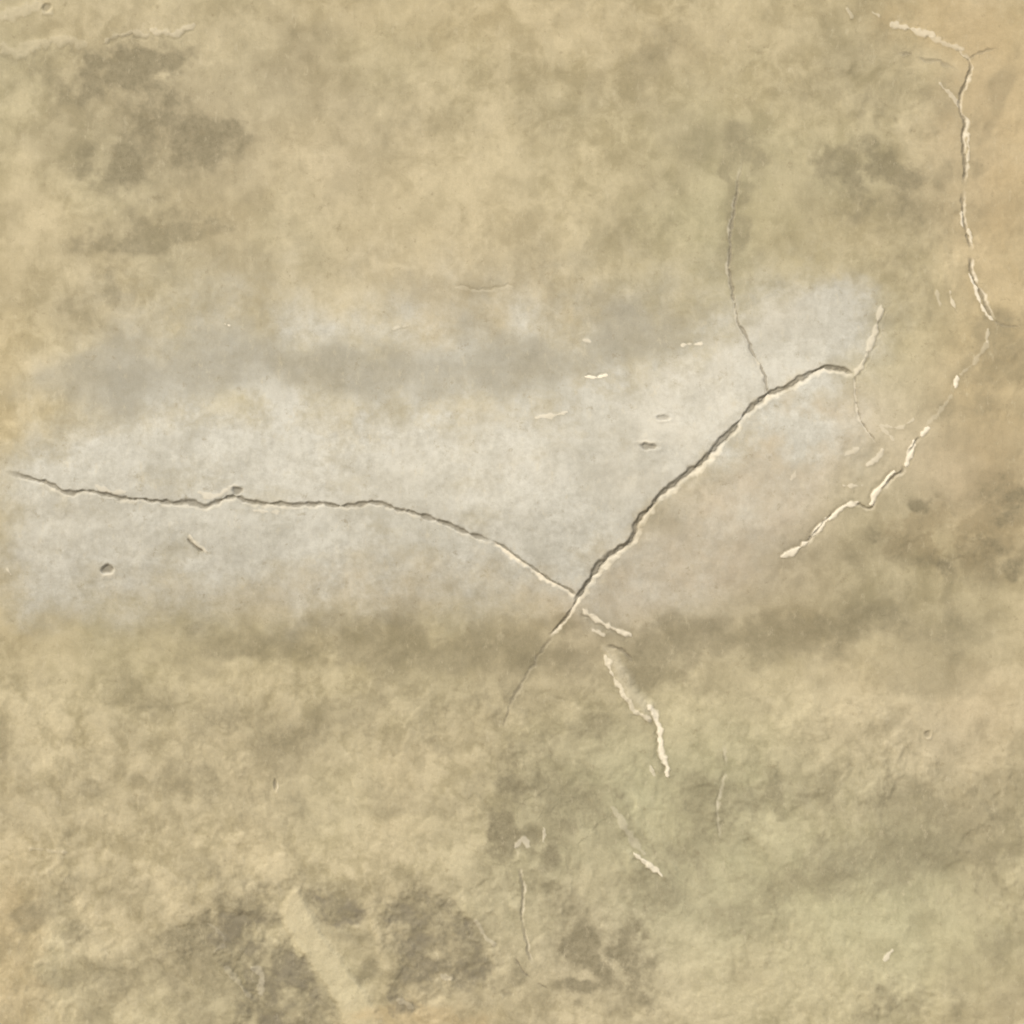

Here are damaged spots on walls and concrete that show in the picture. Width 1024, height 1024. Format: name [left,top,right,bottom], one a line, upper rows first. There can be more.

crack [3,147,888,728]
flaking render [599,643,671,781]
crack [778,6,1023,558]